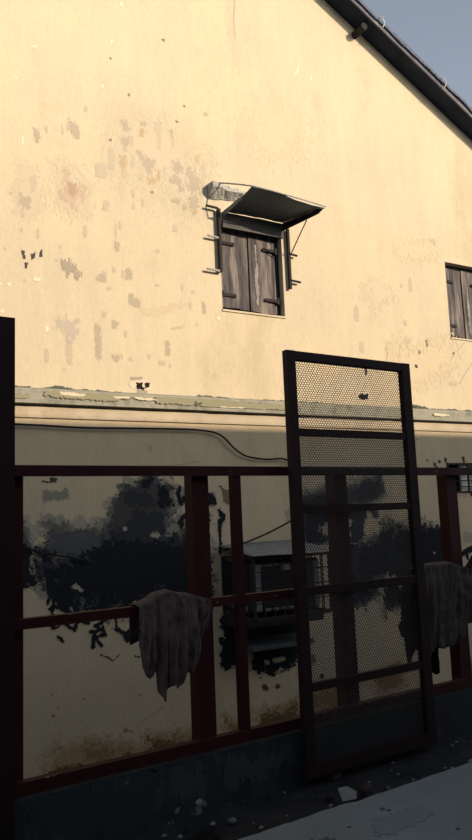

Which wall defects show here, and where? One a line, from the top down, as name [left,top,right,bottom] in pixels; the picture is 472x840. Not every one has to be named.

peeling [57,168,91,211]
peeling [54,245,82,281]
peeling [96,267,133,291]
peeling [44,314,83,371]
peeling [94,311,132,363]
water stain [23,476,187,615]
water stain [208,491,226,597]
water stain [347,476,412,621]
water stain [421,515,443,563]